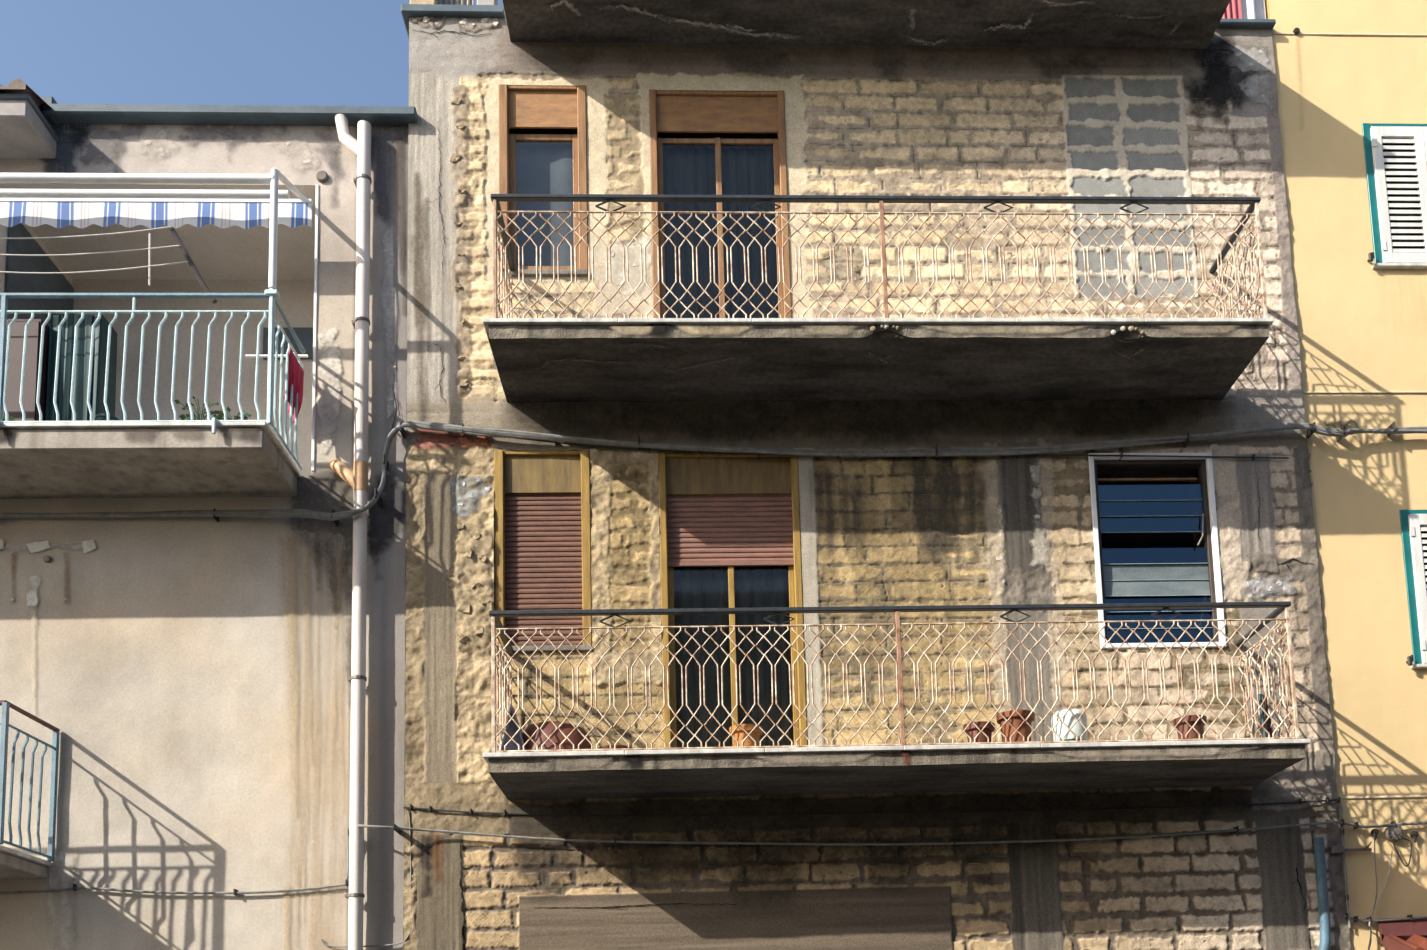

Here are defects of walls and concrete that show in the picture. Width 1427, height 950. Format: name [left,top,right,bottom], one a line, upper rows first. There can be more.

leakage [1186,36,1255,119]
peeling [26,540,51,553]
leakage [291,469,407,676]
leakage [911,456,977,559]